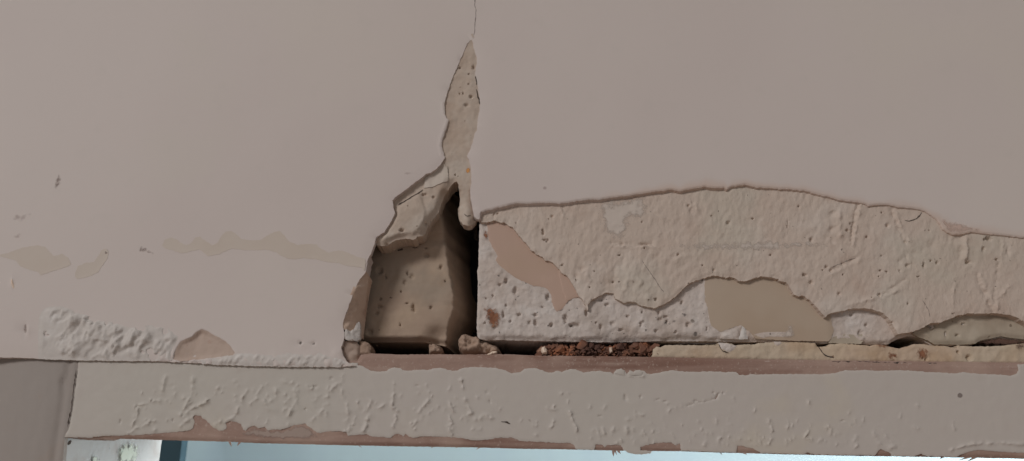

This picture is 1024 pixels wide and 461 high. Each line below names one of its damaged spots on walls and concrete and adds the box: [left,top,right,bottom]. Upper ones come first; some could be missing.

flaking render [343,34,1024,376]
flaking render [173,329,235,361]
peeling [93,415,575,450]
peeling [641,442,681,451]